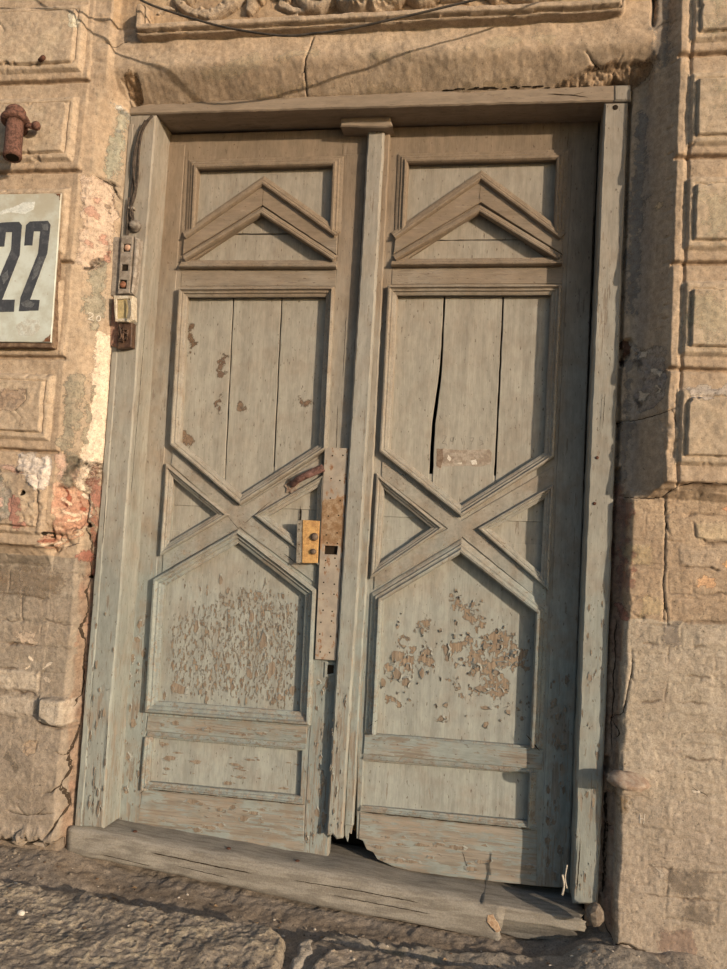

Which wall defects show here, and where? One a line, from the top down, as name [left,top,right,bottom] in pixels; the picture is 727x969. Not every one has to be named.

crack [301,40,313,97]
flaking render [619,340,667,413]
peeling [0,465,27,531]
crack [10,526,93,837]
peeling [163,573,303,709]
peeling [381,589,531,729]